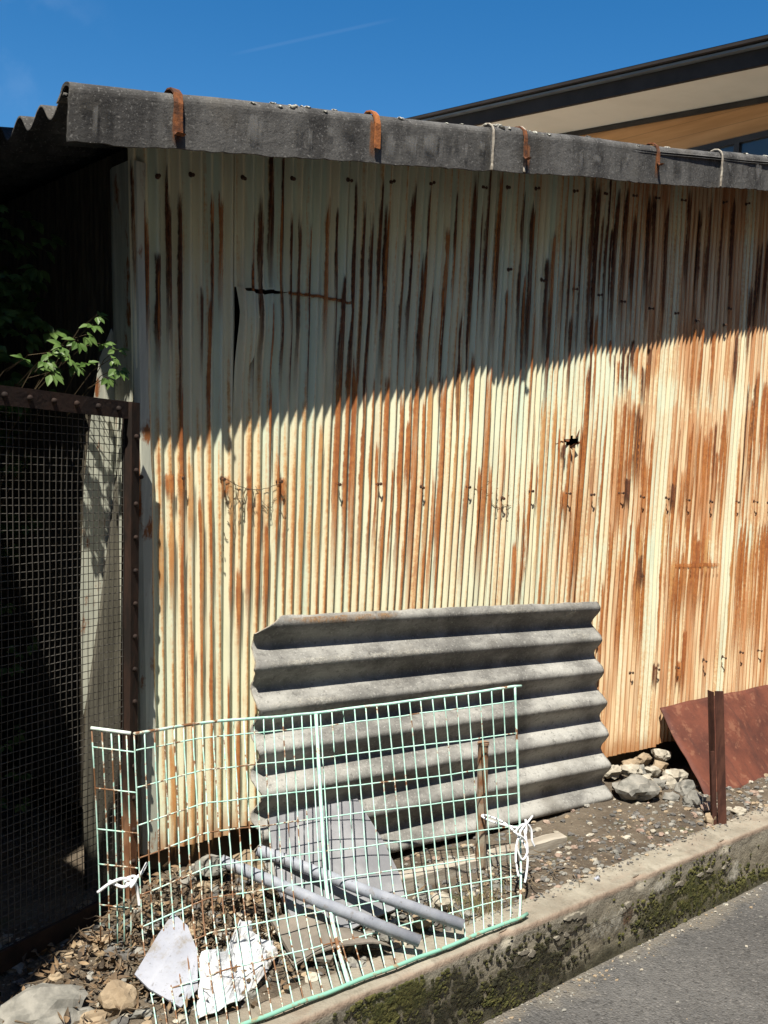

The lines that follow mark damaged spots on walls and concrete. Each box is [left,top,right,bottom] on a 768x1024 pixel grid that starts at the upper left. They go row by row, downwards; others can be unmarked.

corrosion [200,194,224,423]
corrosion [222,157,670,661]
corrosion [690,326,716,389]
corrosion [684,193,736,303]
corrosion [733,244,768,379]
corrosion [652,375,768,683]
corrosion [227,682,240,797]